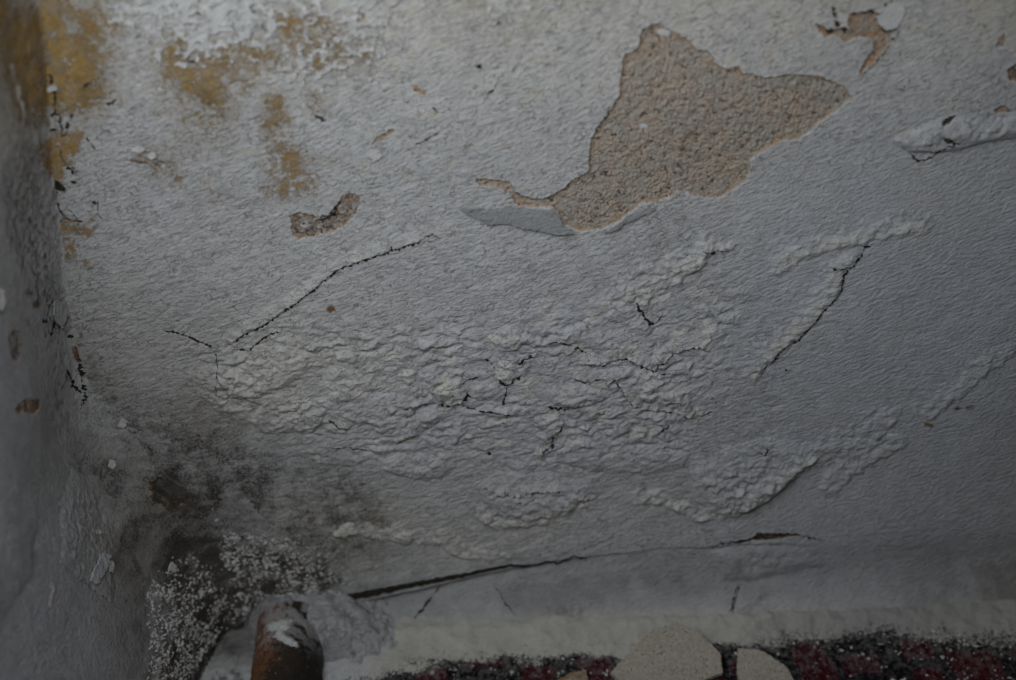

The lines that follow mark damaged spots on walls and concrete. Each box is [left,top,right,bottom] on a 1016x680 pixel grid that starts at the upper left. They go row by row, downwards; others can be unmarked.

flaking render [814,0,906,78]
flaking render [1005,62,1016,84]
flaking render [461,20,856,235]
flaking render [911,113,962,163]
flaking render [287,191,363,241]
crack [164,224,447,391]
crack [755,246,870,378]
crack [392,303,717,444]
crack [533,406,569,457]
damp [118,424,382,680]
crack [347,555,587,619]
crack [712,532,819,548]